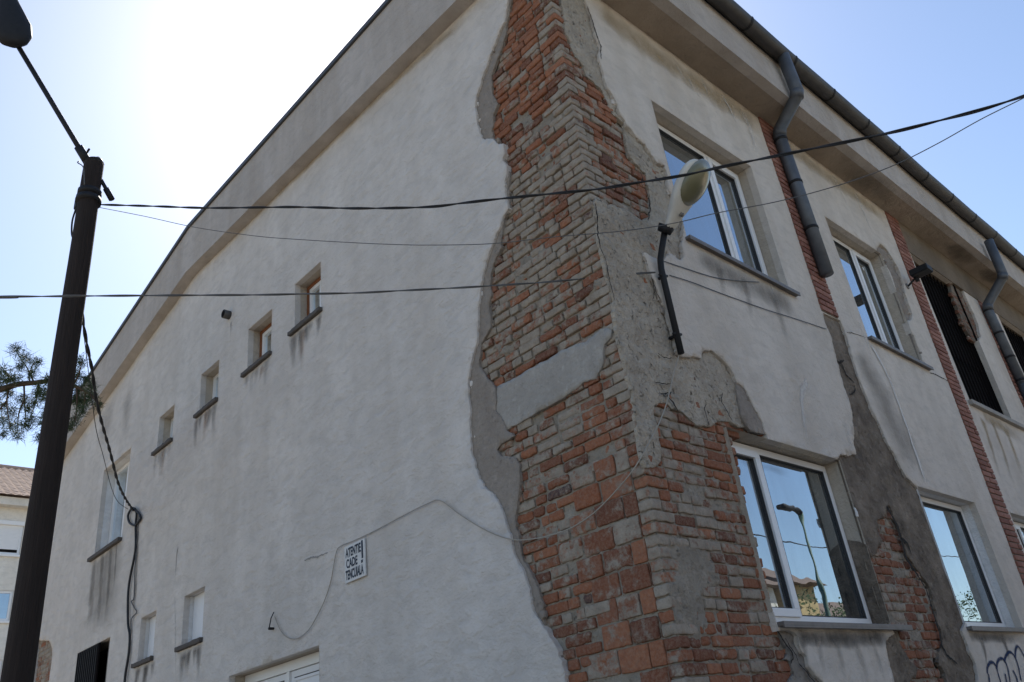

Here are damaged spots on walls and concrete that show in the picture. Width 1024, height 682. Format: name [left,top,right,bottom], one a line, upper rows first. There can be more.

flaking render [469,0,819,682]
flaking render [874,246,914,321]
flaking render [946,283,979,344]
flaking render [824,315,975,682]
flaking render [36,641,52,682]